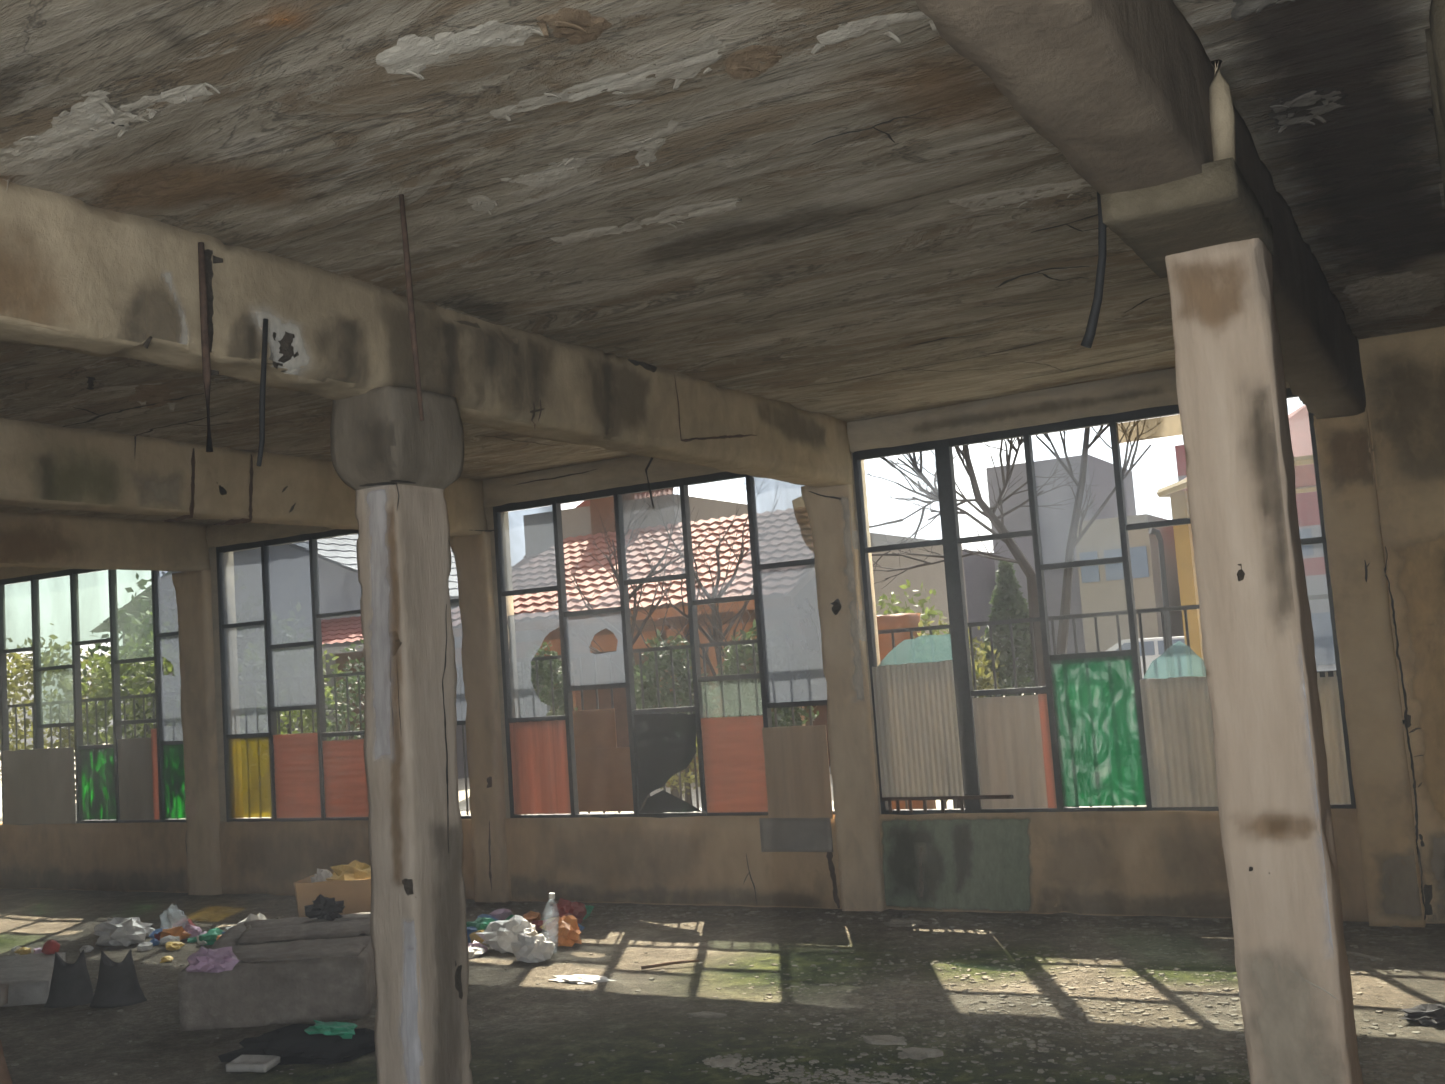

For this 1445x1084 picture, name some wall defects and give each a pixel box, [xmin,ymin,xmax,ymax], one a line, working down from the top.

peeling [376,7,612,80]
peeling [0,82,221,188]
crack [1364,547,1433,920]
leakage [888,825,971,899]